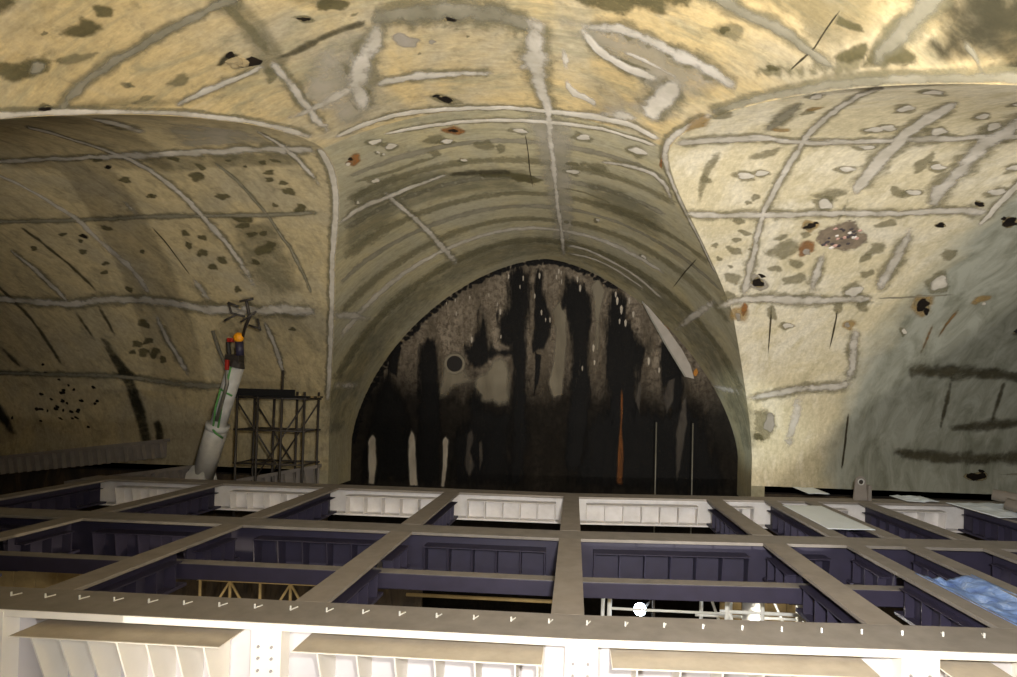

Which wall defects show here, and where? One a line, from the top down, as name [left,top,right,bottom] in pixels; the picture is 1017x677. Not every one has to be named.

crack [791,13,838,69]
corrosion [442,127,465,135]
corrosion [346,154,360,166]
leakage [0,0,1017,441]
spalling [802,220,867,251]
spalling [913,297,932,317]
spalling [35,379,99,428]
leakage [361,267,551,488]
leakage [561,276,725,495]